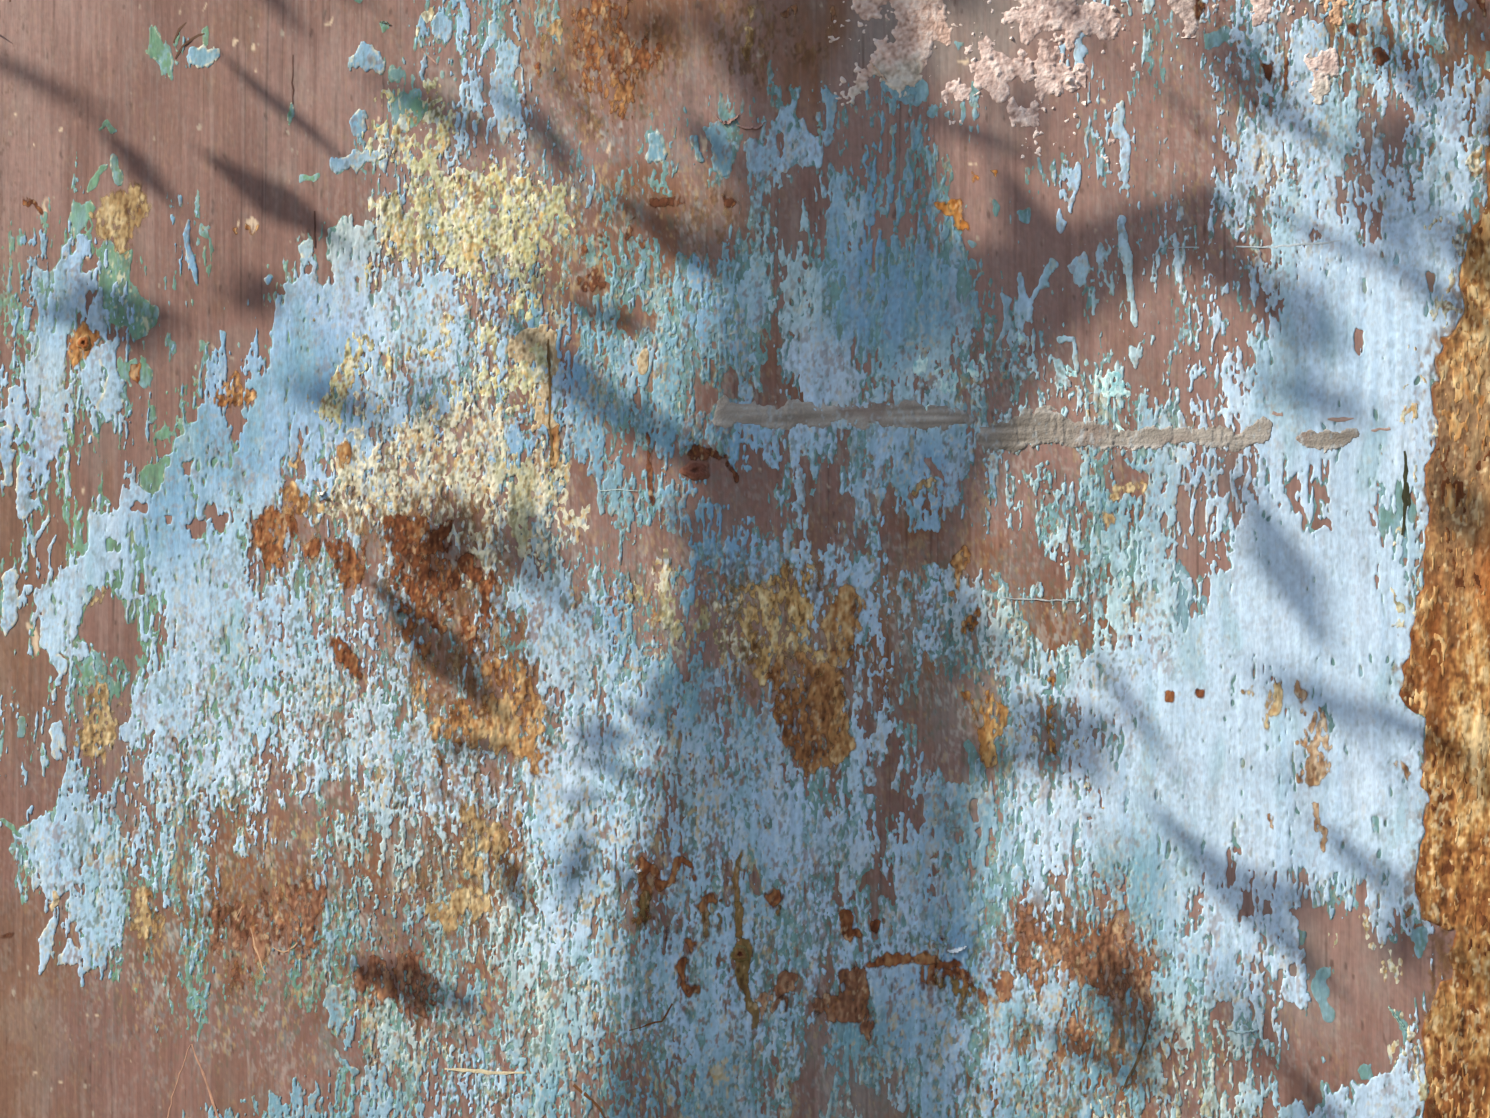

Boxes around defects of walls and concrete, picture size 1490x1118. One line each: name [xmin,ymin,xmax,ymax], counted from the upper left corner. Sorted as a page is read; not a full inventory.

peeling [145,25,220,81]
peeling [1025,71,1140,214]
peeling [164,189,214,290]
peeling [1067,215,1145,328]
peeling [1124,333,1155,369]
peeling [0,695,29,761]
rust [253,441,550,775]
rust [737,563,866,777]
rust [1241,680,1332,852]
rust [1394,129,1490,1118]
rust [632,851,799,1030]
rust [812,905,1155,1041]